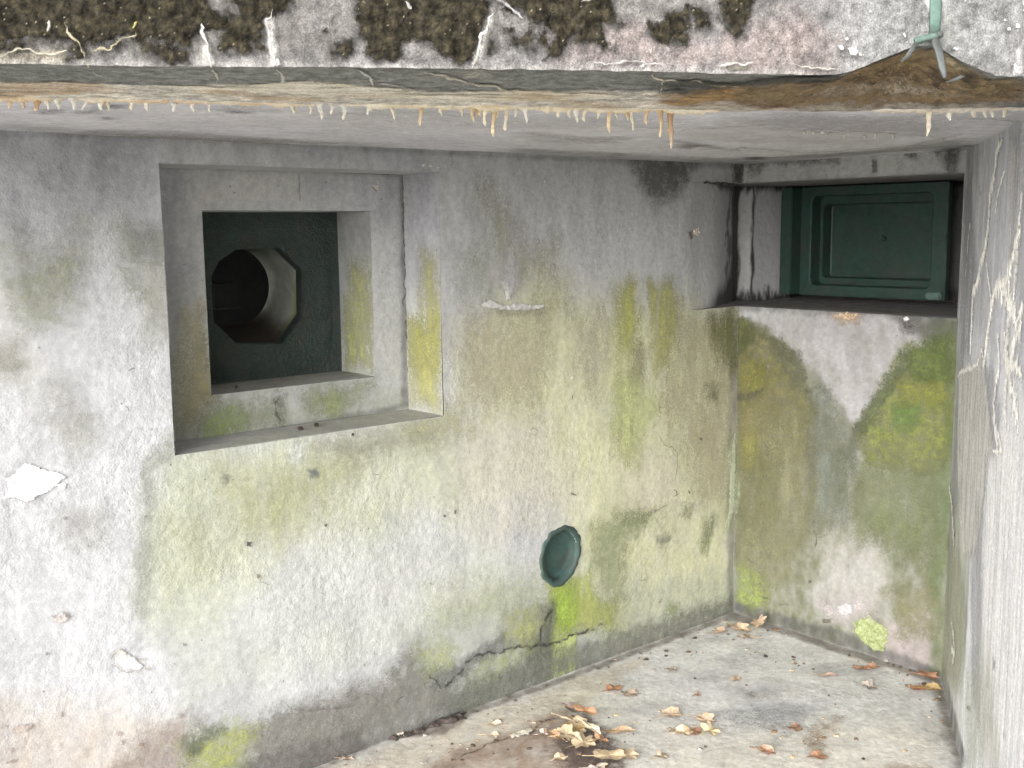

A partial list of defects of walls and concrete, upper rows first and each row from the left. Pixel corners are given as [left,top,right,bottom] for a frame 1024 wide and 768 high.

efflorescence [0,81,725,142]
leakage [736,107,1024,358]
spalling [4,463,66,504]
spalling [110,648,151,673]
crack [429,608,602,690]
leakage [580,280,774,513]
leakage [807,386,960,566]
leakage [970,360,1024,768]